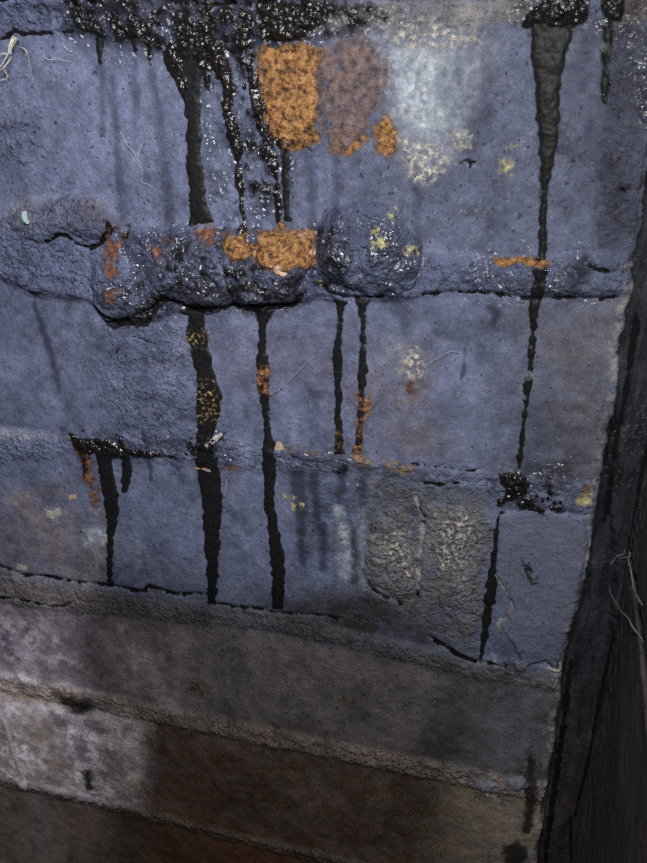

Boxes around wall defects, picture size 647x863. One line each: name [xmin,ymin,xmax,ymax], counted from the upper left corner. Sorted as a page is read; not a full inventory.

damp [96,36,104,64]
damp [129,36,292,234]
corrosion [256,33,401,157]
damp [600,23,614,104]
corrosion [103,228,126,303]
corrosion [193,220,316,277]
corrosion [494,256,550,268]
damp [516,23,573,468]
damp [179,304,223,605]
damp [243,304,304,609]
damp [332,297,370,474]
damp [479,511,505,659]